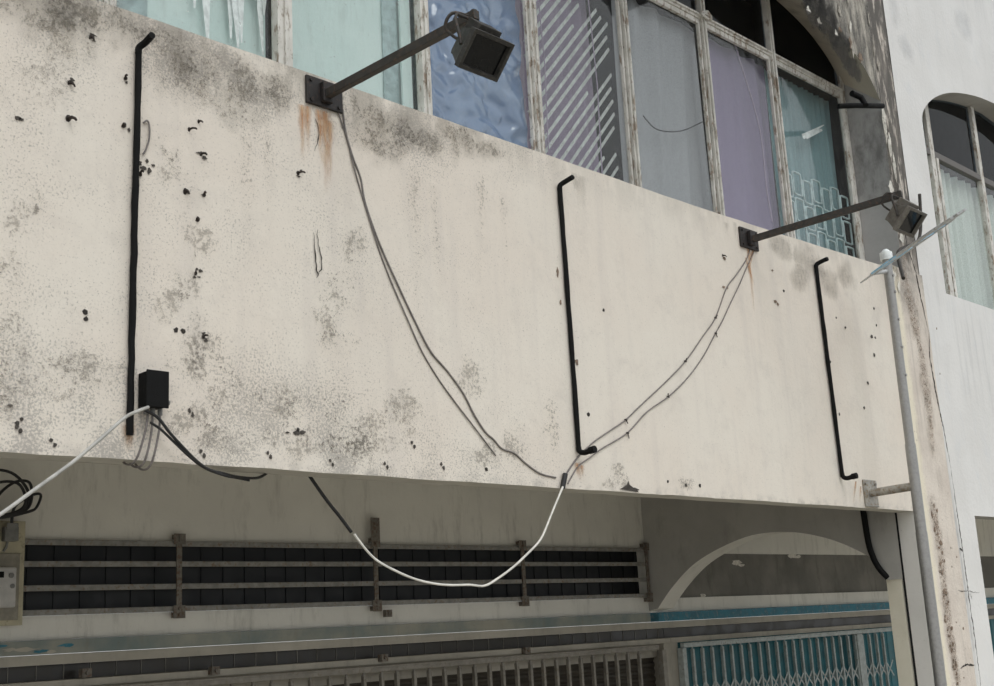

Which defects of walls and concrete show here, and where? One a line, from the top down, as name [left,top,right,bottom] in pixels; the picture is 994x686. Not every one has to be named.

mould [803,0,861,82]